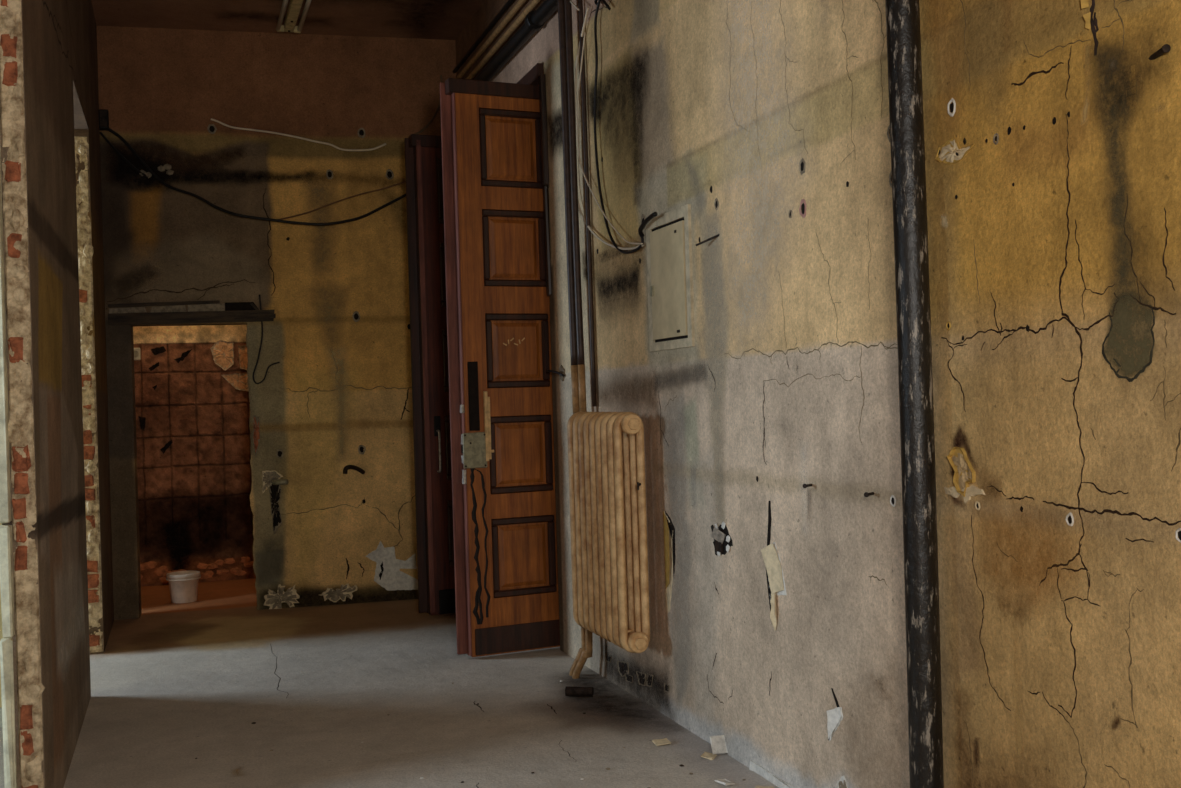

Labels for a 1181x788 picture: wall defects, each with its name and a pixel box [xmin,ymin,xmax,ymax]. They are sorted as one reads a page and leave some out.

crack [726,0,808,155]
crack [842,0,886,162]
leakage [1086,47,1154,377]
spalling [149,346,192,371]
spalling [210,340,249,391]
crack [708,234,897,464]
crack [941,0,1181,788]
spalling [944,447,985,510]
spalling [320,583,357,602]
peeling [365,541,418,591]
spalling [711,522,733,556]
spalling [749,760,796,788]